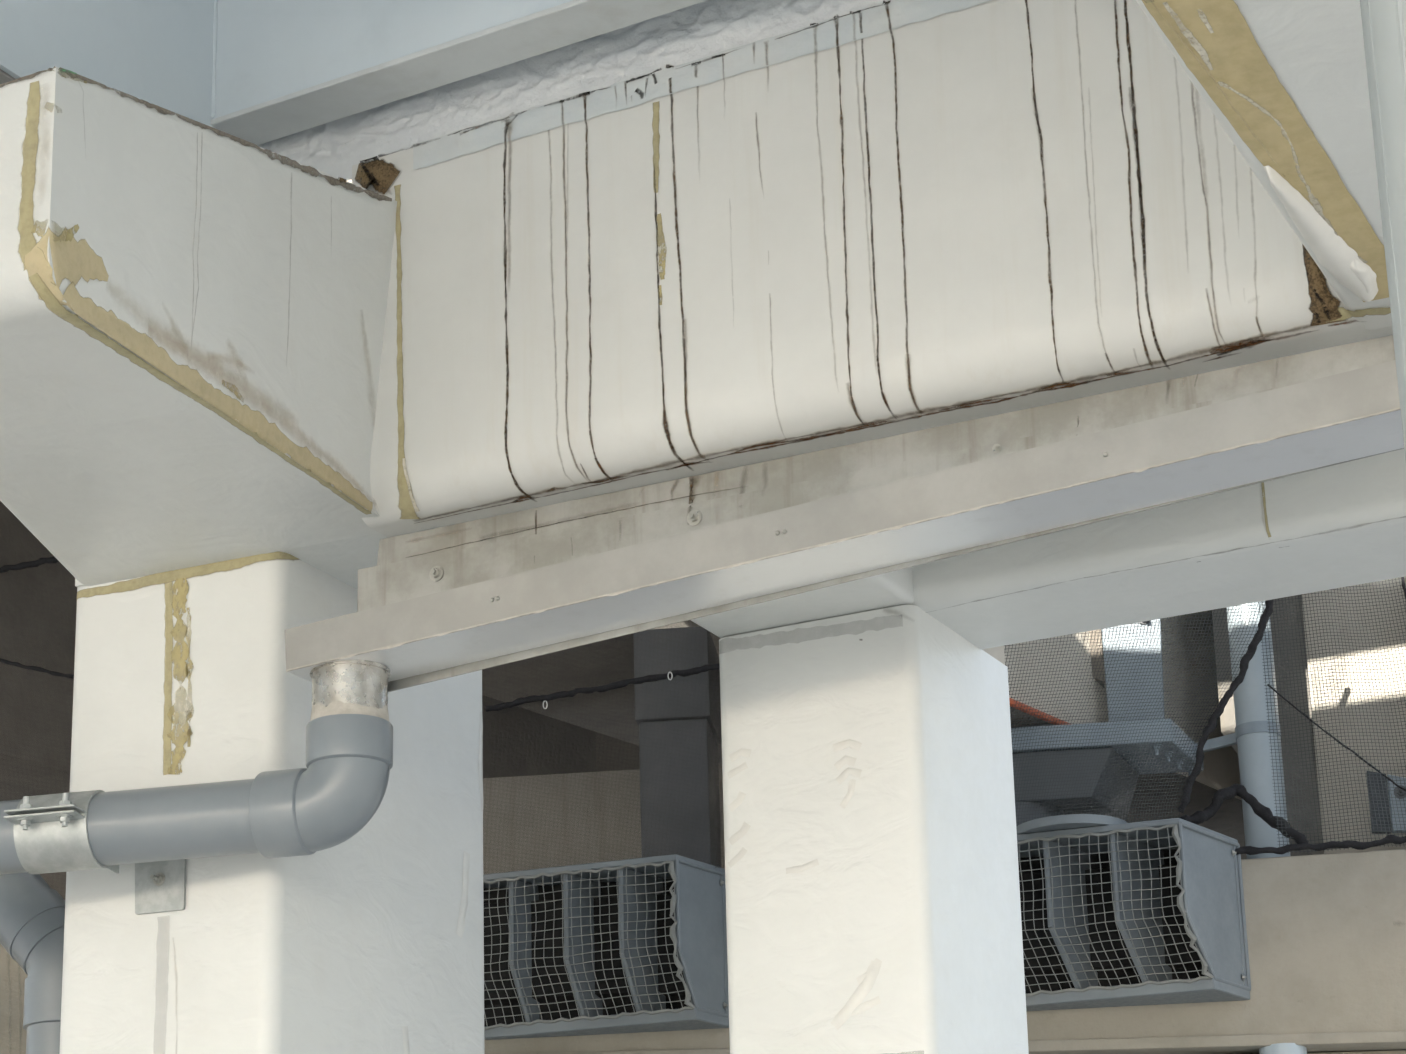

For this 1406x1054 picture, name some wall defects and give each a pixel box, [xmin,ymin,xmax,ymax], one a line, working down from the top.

peeling [18,67,419,519]
crack [778,6,875,39]
peeling [1142,0,1391,326]
peeling [77,551,298,775]